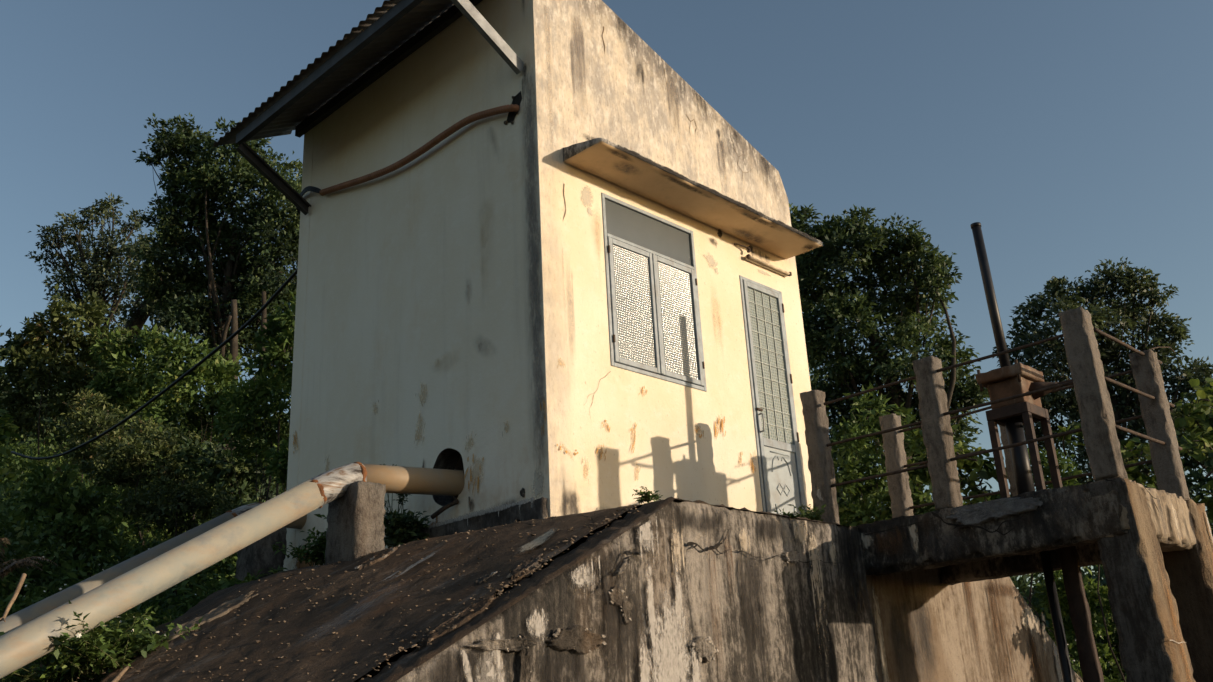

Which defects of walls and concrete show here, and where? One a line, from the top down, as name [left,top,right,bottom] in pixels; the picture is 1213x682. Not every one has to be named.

water stain [612,145,819,249]
water stain [522,65,544,439]
water stain [563,493,578,516]
spalling [411,553,543,652]
spalling [608,556,633,625]
water stain [571,507,724,682]
water stain [739,516,836,658]
water stain [434,633,504,682]
spalling [463,624,607,682]
water stain [527,608,585,682]
spalling [689,636,719,663]
water stain [1022,607,1064,682]